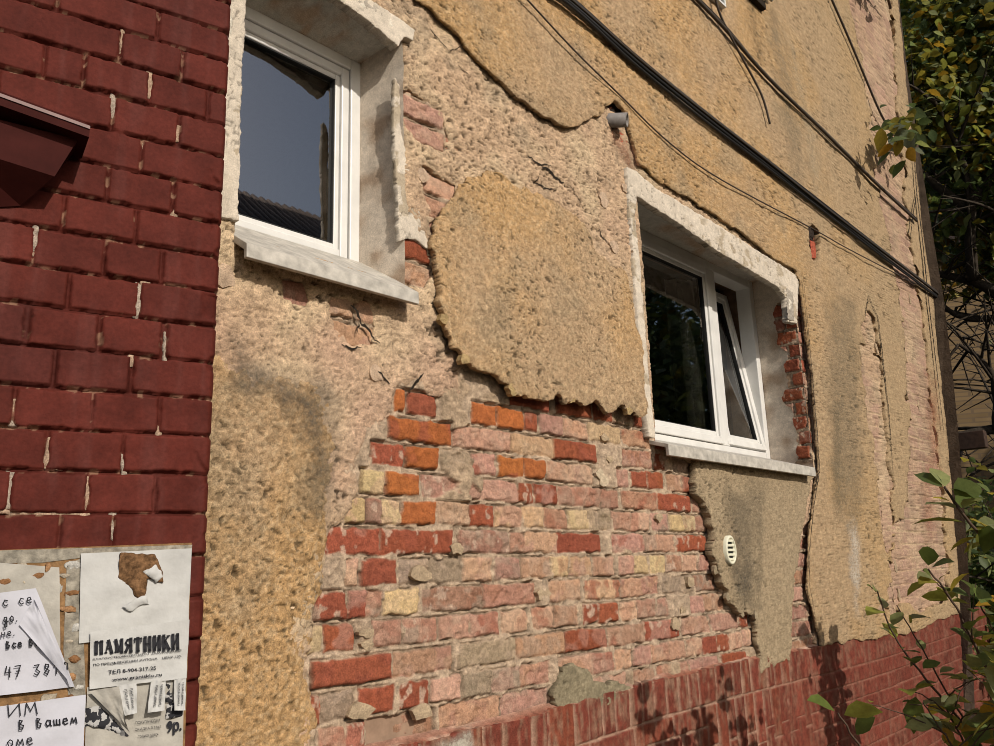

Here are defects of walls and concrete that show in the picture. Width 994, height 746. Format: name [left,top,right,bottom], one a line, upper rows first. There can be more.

peeling [132,281,150,319]
crack [342,305,380,350]
flaking render [849,0,949,615]
crack [378,371,424,390]
spalling [215,0,819,746]
peeling [43,437,63,471]
peeling [0,471,90,516]